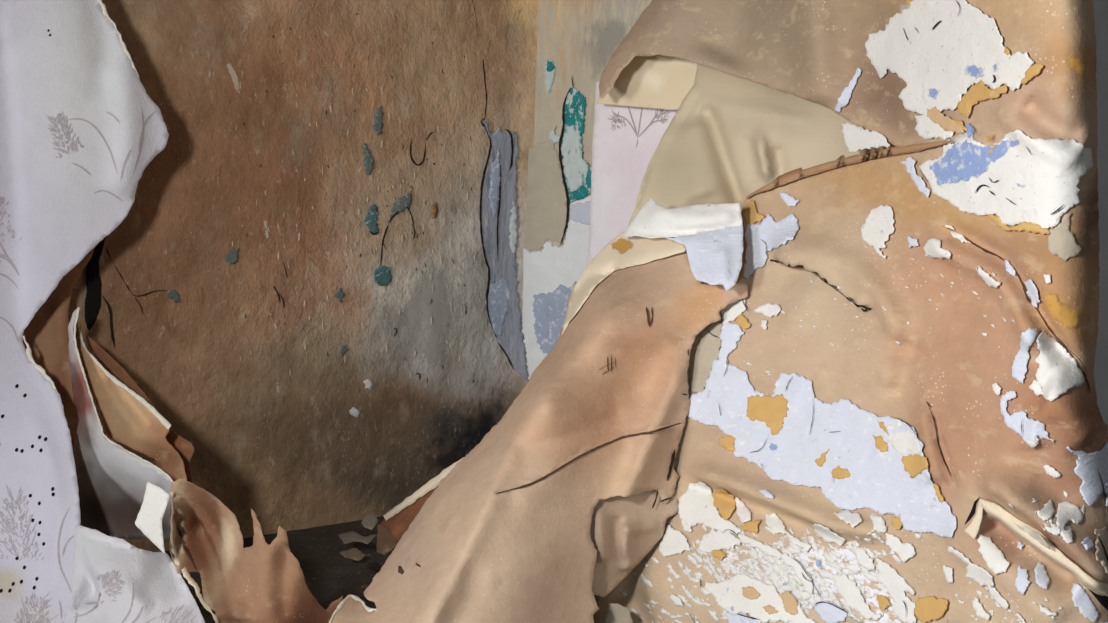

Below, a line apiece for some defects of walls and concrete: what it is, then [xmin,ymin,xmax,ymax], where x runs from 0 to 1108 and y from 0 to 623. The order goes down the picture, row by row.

peeling [544,60,556,93]
flaking render [342,86,453,242]
peeling [834,0,1093,261]
flaking render [346,235,395,287]
peeling [743,192,800,279]
peeling [907,225,971,282]
peeling [972,257,1078,328]
peeling [631,299,1108,623]